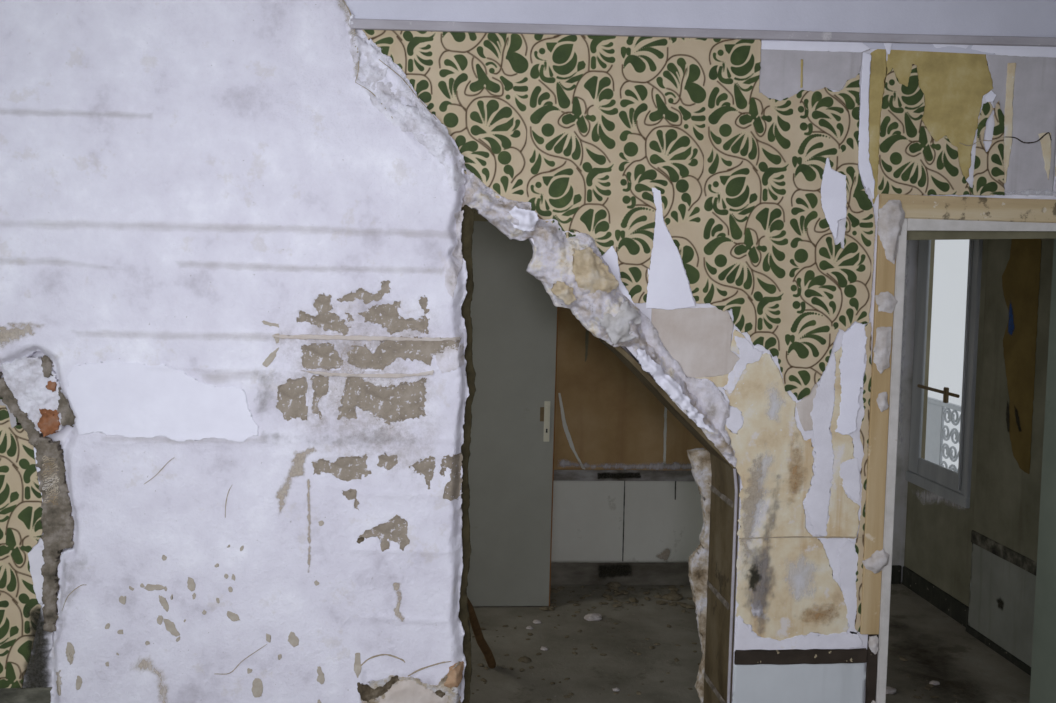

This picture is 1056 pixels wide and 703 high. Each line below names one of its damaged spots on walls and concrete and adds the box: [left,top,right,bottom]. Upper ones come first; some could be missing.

peeling [276,280,464,425]
spalling [348,14,737,703]
spalling [0,355,75,657]
peeling [311,453,463,510]
leakage [741,457,771,615]
spalling [66,642,75,664]
spalling [247,668,263,697]
spalling [288,632,299,647]
spalling [317,666,325,684]